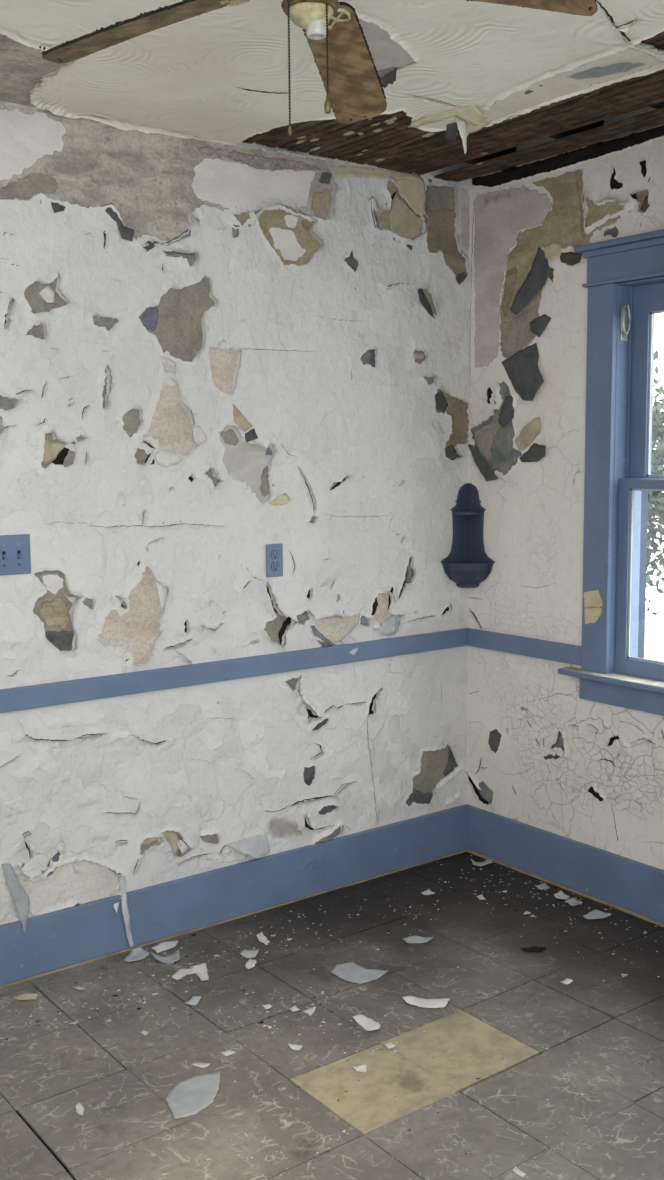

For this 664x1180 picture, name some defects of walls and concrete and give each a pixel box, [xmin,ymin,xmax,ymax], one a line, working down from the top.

crack [578,0,644,67]
crack [404,93,512,117]
peeling [0,27,664,511]
peeling [25,555,228,673]
peeling [256,553,418,655]
spalling [583,590,604,624]
peeling [277,671,333,738]
peeling [298,760,322,791]
peeling [402,737,495,812]
crack [436,691,664,844]
peeling [296,796,346,846]
peeling [3,824,270,924]